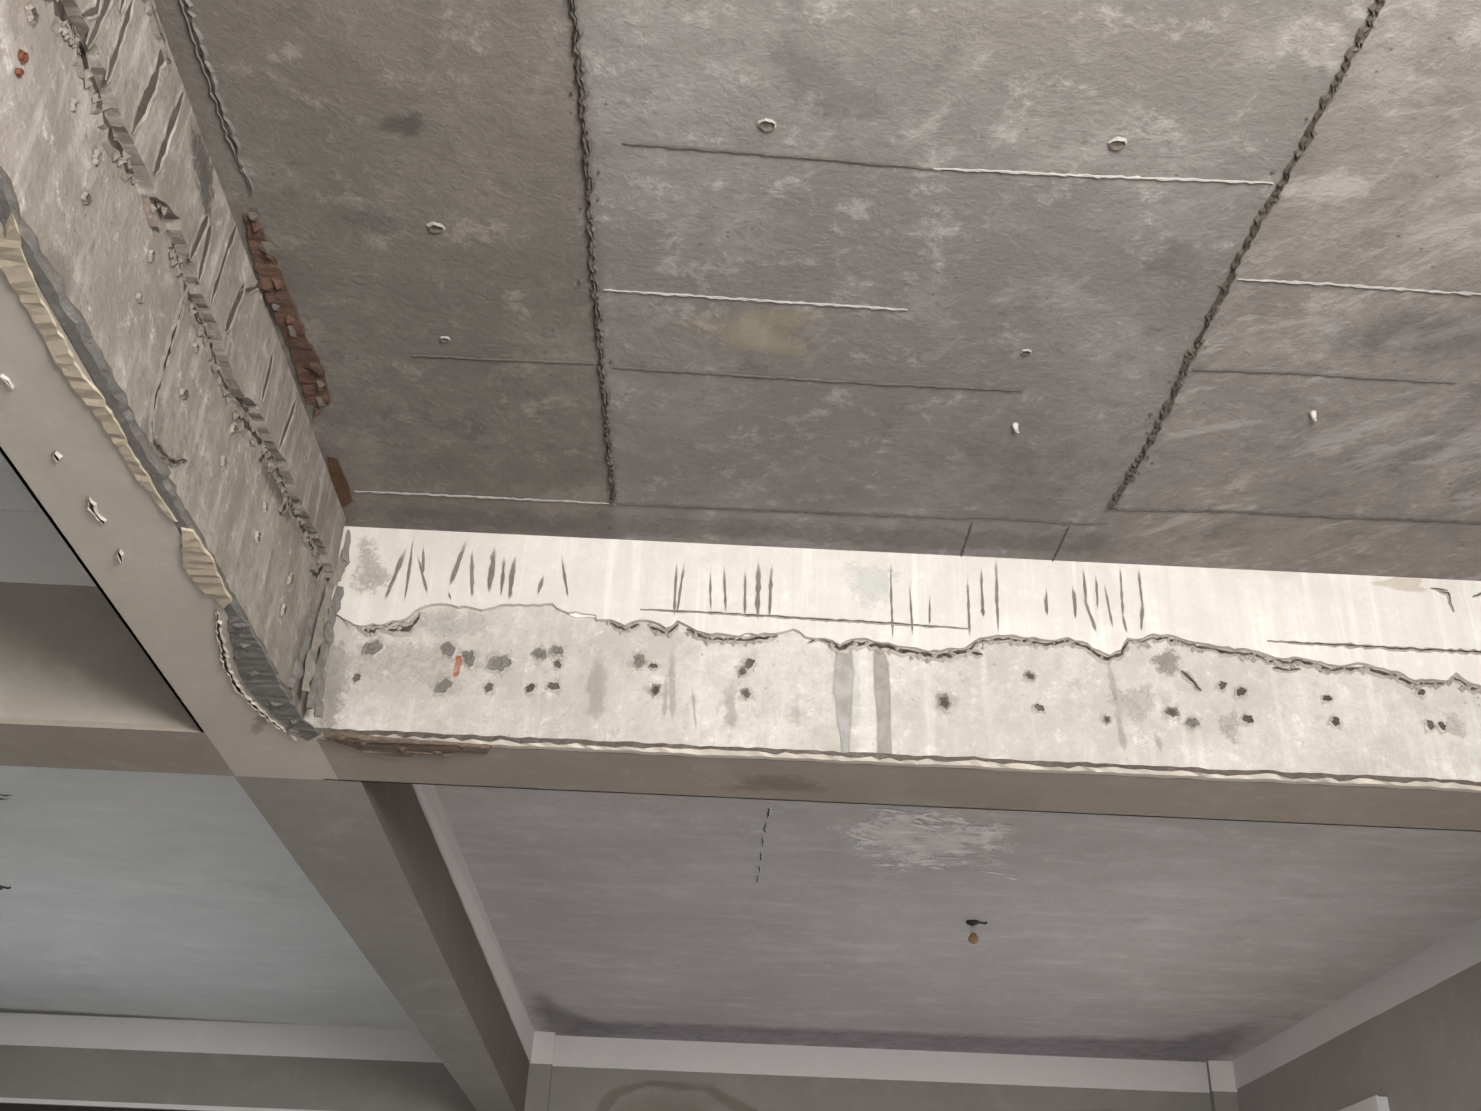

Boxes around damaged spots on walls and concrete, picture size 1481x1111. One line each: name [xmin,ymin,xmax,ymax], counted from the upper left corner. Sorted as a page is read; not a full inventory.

spalling [15,49,29,77]
spalling [25,4,39,27]
crack [43,0,136,185]
spalling [82,0,135,84]
spalling [131,41,185,176]
crack [141,0,254,195]
crack [148,231,324,586]
corrosion [327,457,352,507]
spalling [0,166,1481,793]
crack [85,497,124,563]
crack [1431,587,1481,612]
crack [606,609,1481,695]